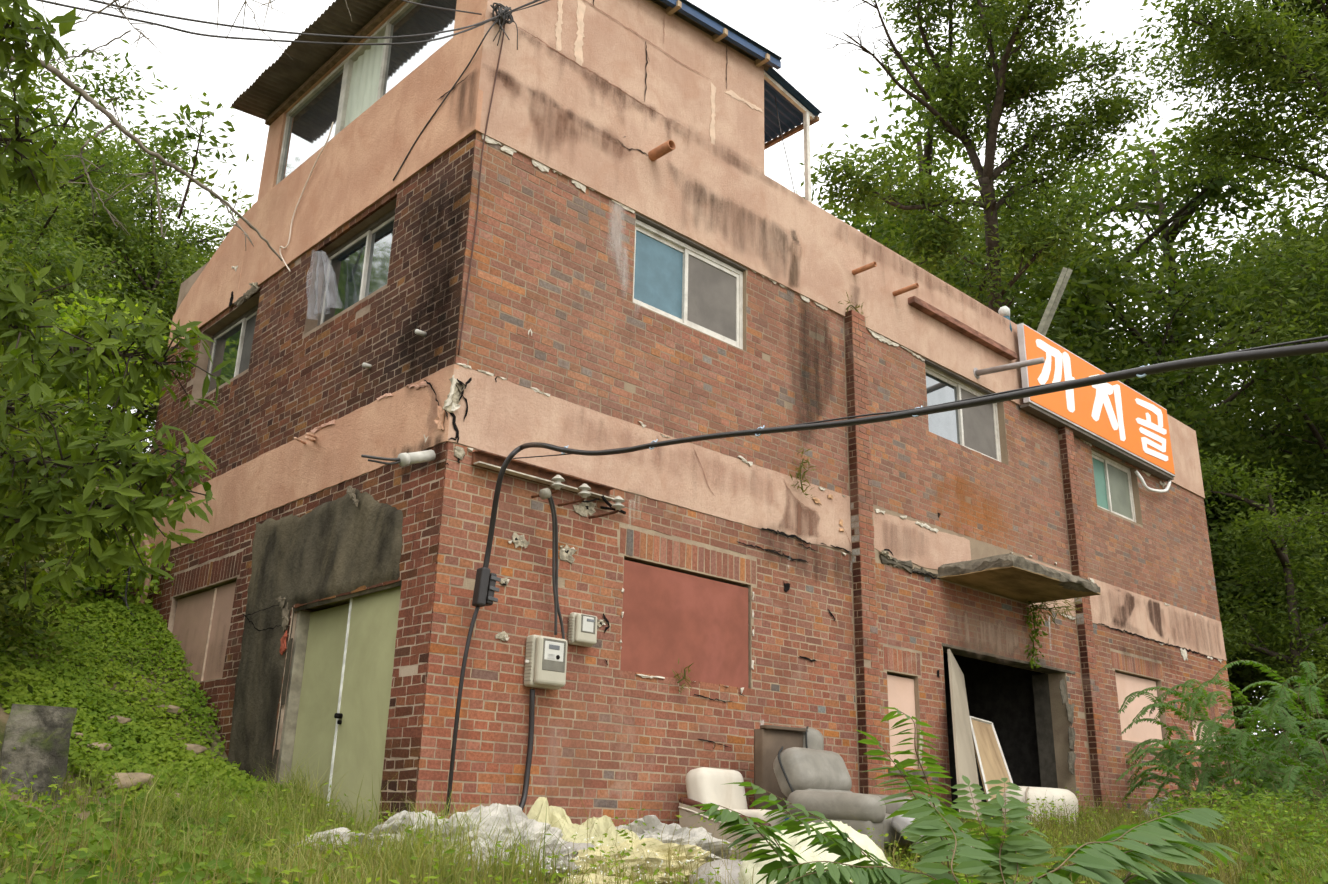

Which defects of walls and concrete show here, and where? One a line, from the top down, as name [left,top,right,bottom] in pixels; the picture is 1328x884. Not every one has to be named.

crack [514,0,728,115]
flaking render [481,134,517,156]
flaking render [532,160,595,193]
flaking render [442,363,507,413]
damp [1114,595,1162,636]